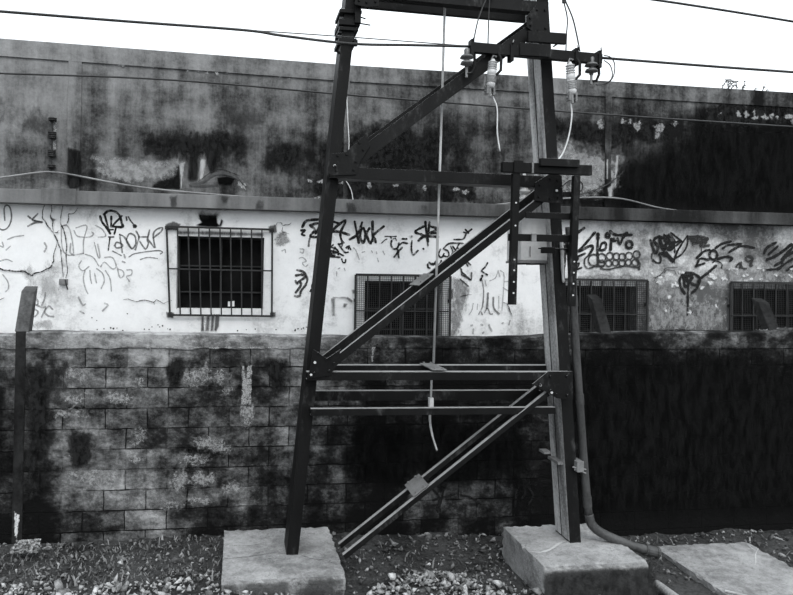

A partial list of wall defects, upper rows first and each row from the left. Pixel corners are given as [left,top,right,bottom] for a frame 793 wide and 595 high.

leakage [67,147,81,189]
leakage [260,143,303,172]
leakage [341,121,389,153]
leakage [359,121,470,173]
leakage [555,103,793,212]
leakage [336,181,476,213]
crack [0,205,78,276]
leakage [0,370,12,450]
leakage [18,362,69,499]
leakage [68,431,92,468]
leakage [570,353,793,515]